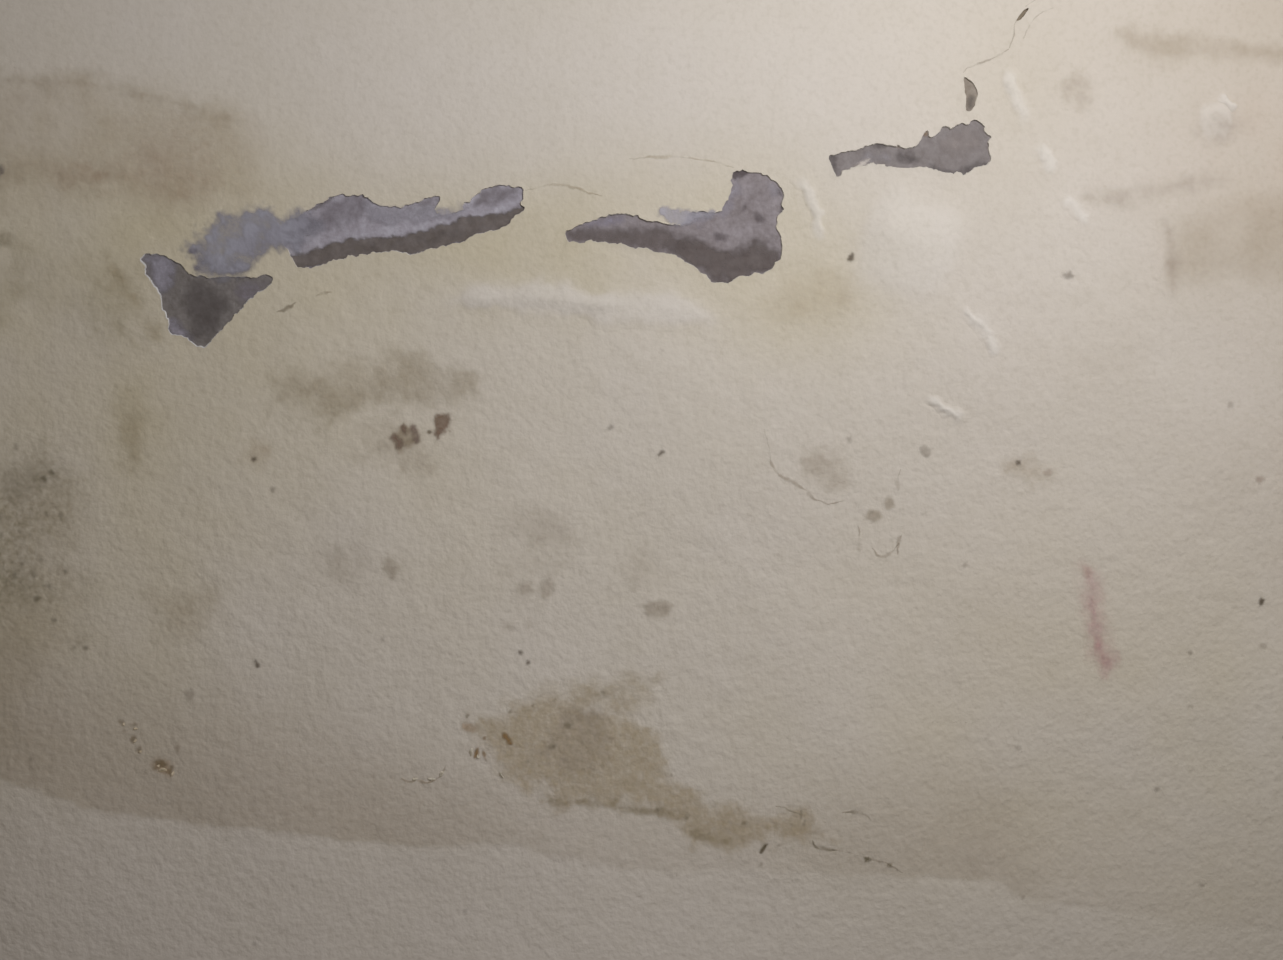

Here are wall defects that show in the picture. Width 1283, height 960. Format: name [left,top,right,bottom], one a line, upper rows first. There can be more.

peeling [829,77,991,177]
peeling [140,185,525,348]
peeling [565,170,784,284]